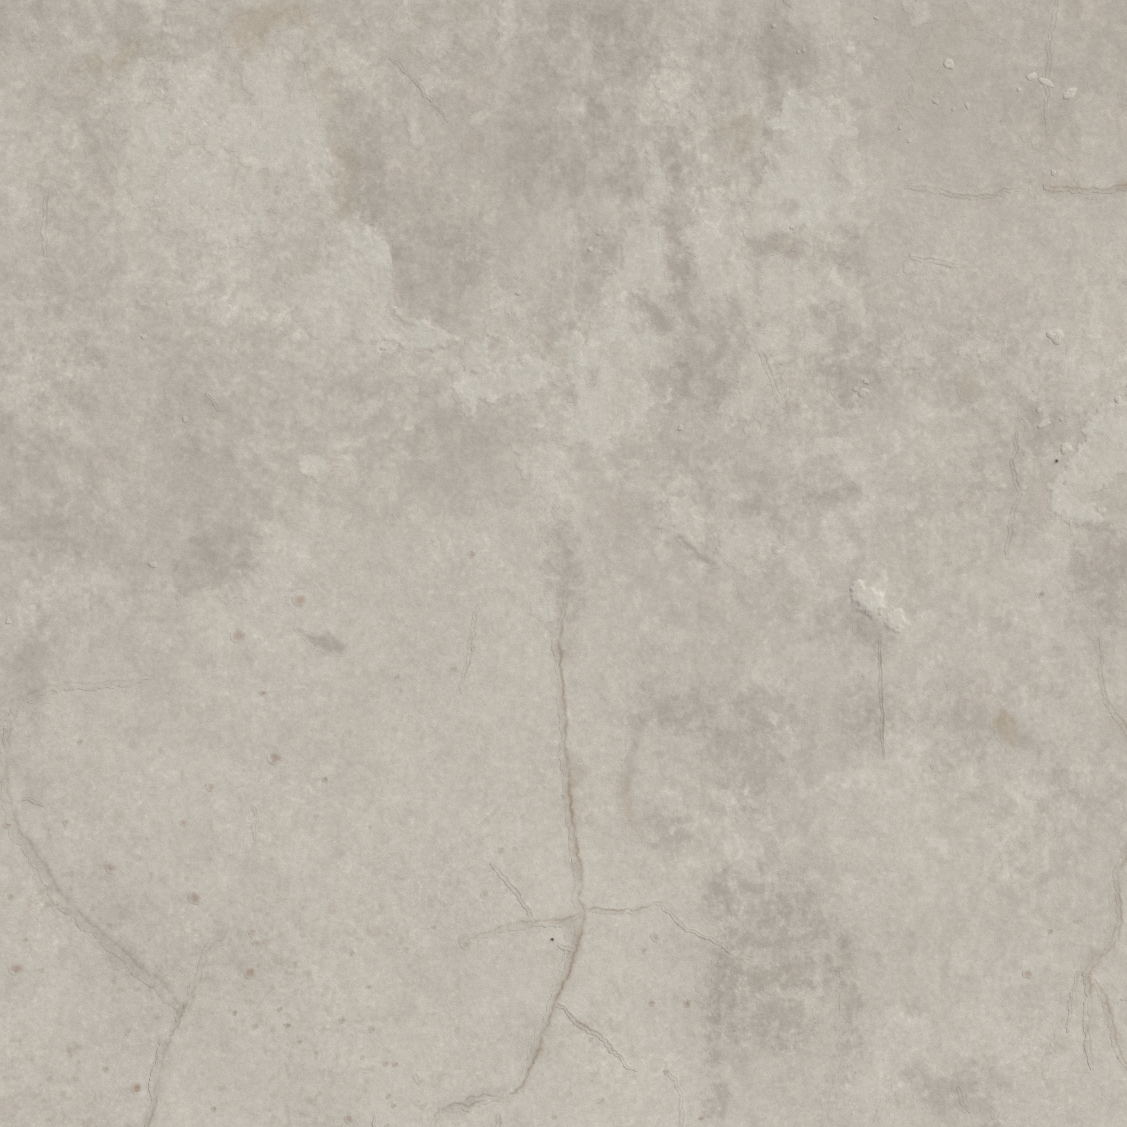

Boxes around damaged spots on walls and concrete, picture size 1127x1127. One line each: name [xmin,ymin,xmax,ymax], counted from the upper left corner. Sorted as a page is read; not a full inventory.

crack [0,673,235,1127]
crack [430,591,734,1127]
crack [1066,843,1127,1075]
crack [1098,638,1127,741]